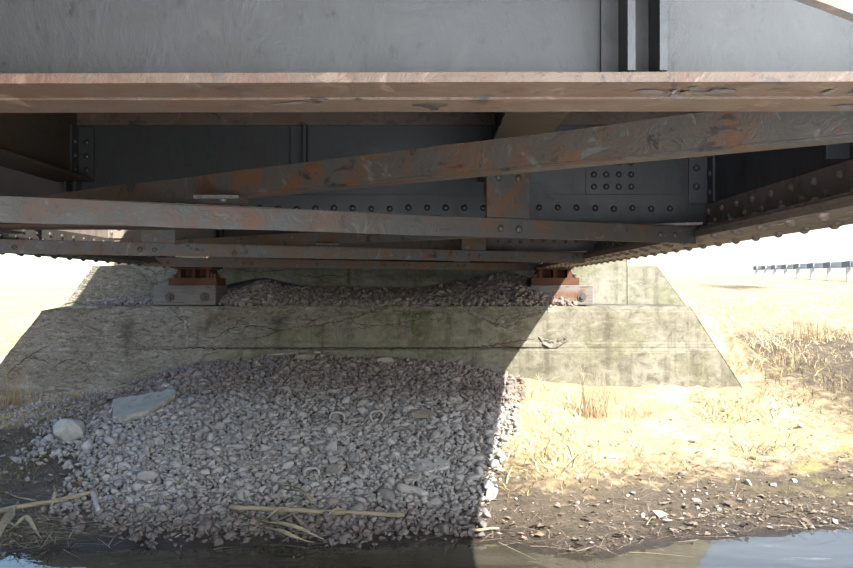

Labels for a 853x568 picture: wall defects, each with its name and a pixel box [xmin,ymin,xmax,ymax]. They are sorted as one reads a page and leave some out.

crack [129,308,542,350]